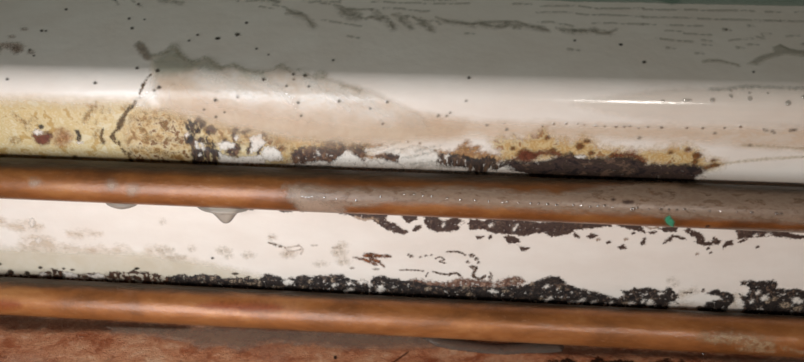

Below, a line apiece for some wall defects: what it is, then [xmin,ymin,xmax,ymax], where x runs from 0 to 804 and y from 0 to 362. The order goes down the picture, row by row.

crack [100,74,152,162]
water stain [0,101,404,171]
peeling [339,213,804,254]